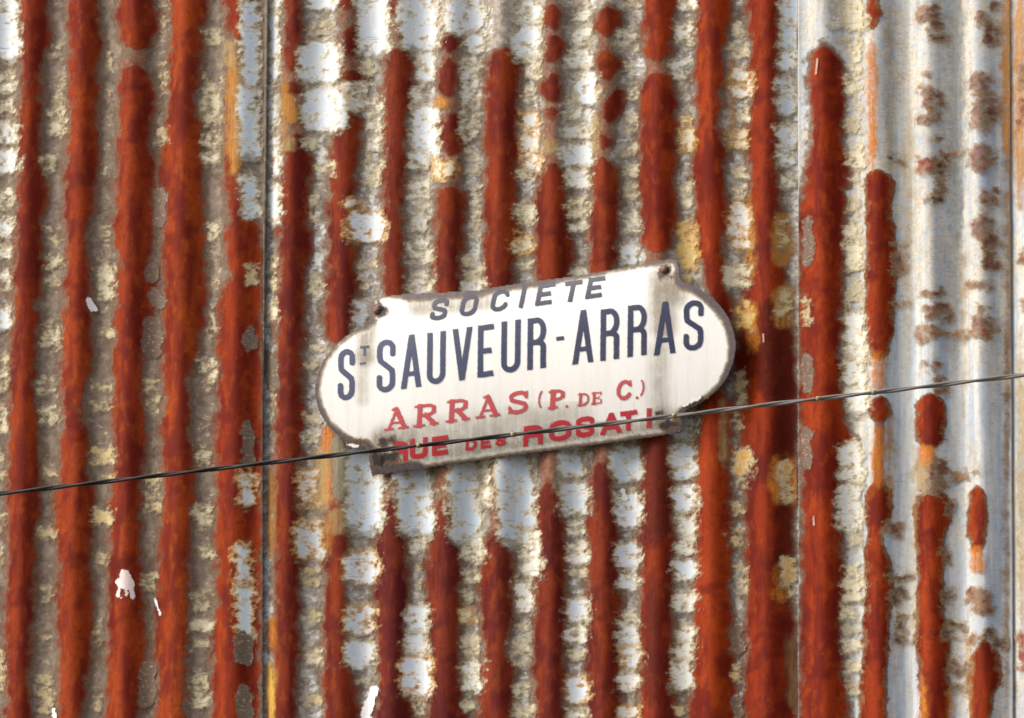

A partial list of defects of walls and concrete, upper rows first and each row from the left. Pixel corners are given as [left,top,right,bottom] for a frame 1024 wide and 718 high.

rust [0,0,574,718]
peeling [295,0,490,294]
peeling [508,0,547,182]
peeling [557,0,602,232]
rust [428,0,1024,718]
peeling [722,167,756,334]
peeling [771,0,798,190]
peeling [341,444,547,718]
peeling [556,447,593,578]
peeling [608,440,645,595]
peeling [614,608,644,718]
peeling [666,417,702,693]